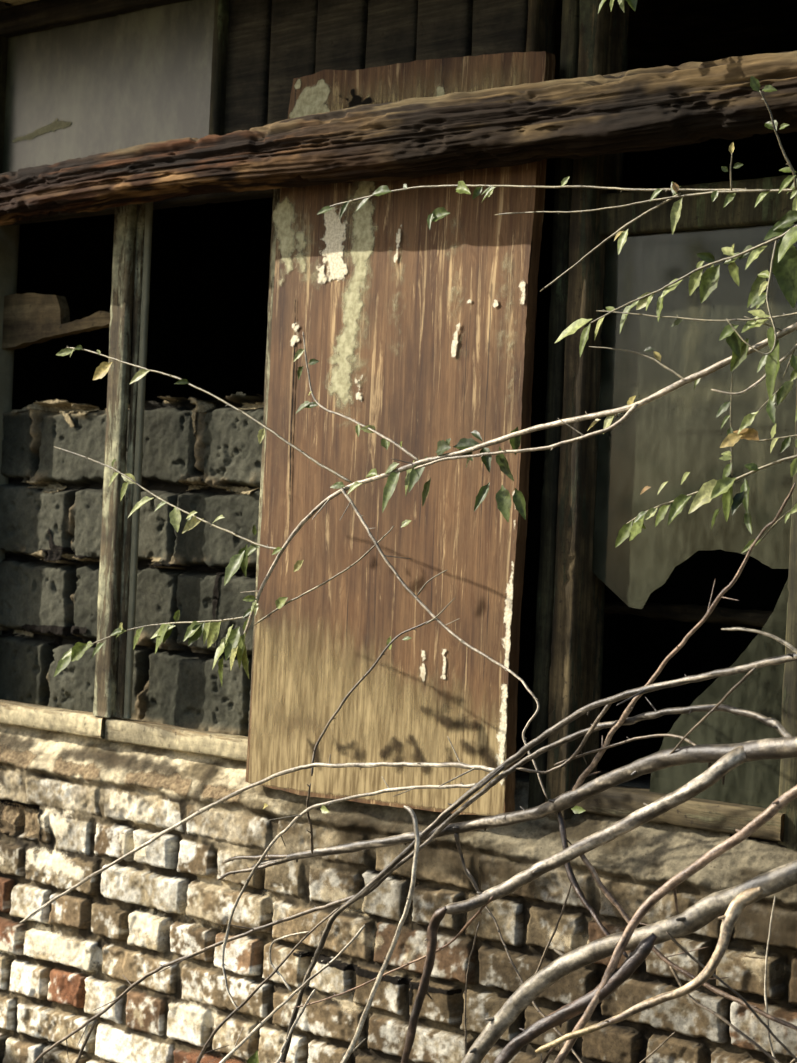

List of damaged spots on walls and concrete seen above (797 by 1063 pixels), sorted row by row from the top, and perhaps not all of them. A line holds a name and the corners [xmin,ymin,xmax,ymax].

peeling [289,79,348,118]
peeling [273,181,377,404]
peeling [503,561,514,668]
leakage [0,734,33,785]
leakage [59,748,177,775]
leakage [190,765,214,801]
leakage [248,622,506,815]
peeling [495,684,508,785]
leakage [312,812,519,948]
leakage [713,905,797,1014]
leakage [0,1048,21,1063]
leakage [41,1041,63,1063]